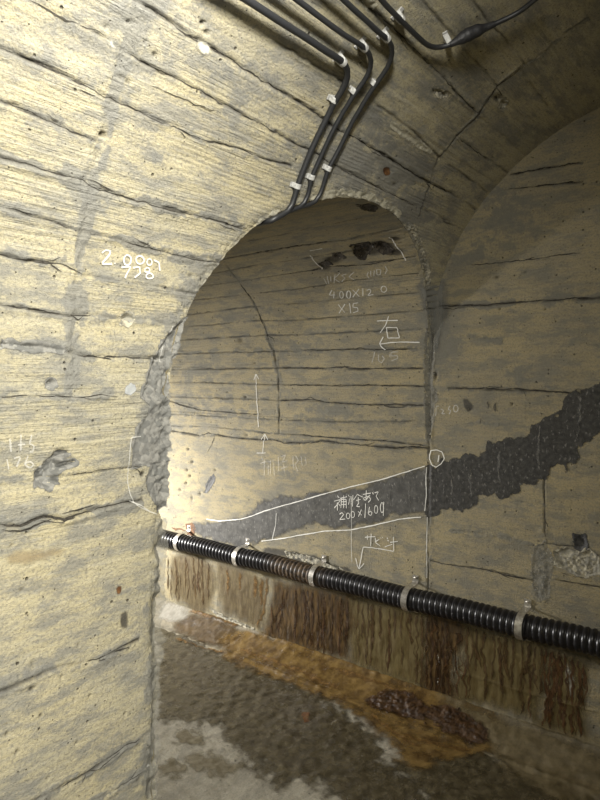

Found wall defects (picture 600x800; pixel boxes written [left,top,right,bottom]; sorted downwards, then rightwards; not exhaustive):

crack [2,48,285,164]
crack [0,157,243,231]
crack [0,254,80,273]
crack [125,238,343,263]
spalling [318,241,395,266]
crack [438,297,589,309]
spalling [131,317,188,513]
spalling [33,450,79,492]
crack [0,500,135,532]
spalling [553,533,600,579]
rust [167,554,588,768]
leakage [154,604,600,800]